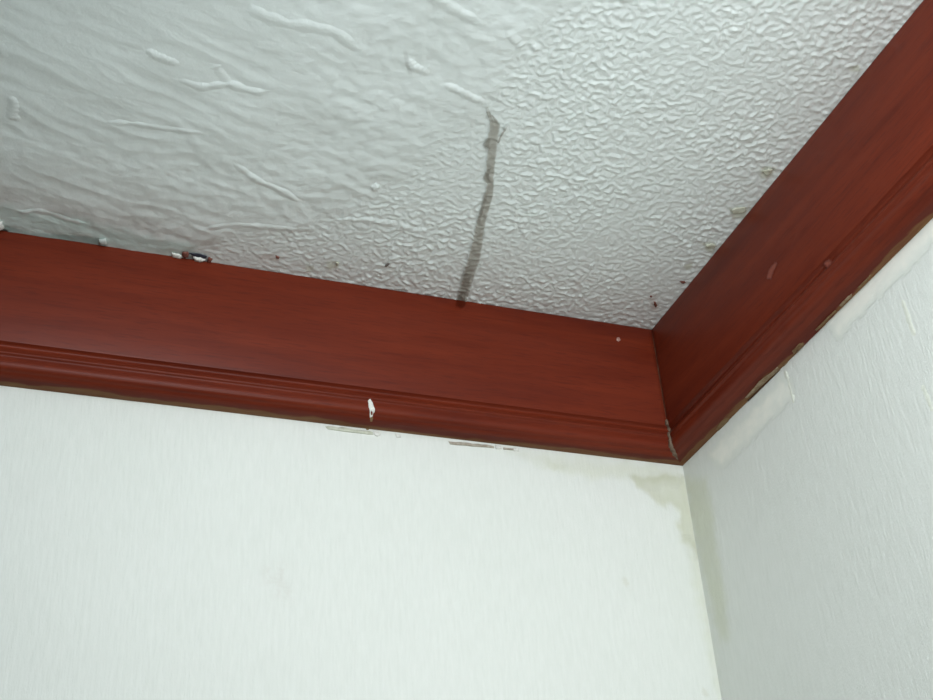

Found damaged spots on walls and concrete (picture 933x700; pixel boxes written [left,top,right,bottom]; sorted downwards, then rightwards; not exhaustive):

flaking render [171,252,213,263]